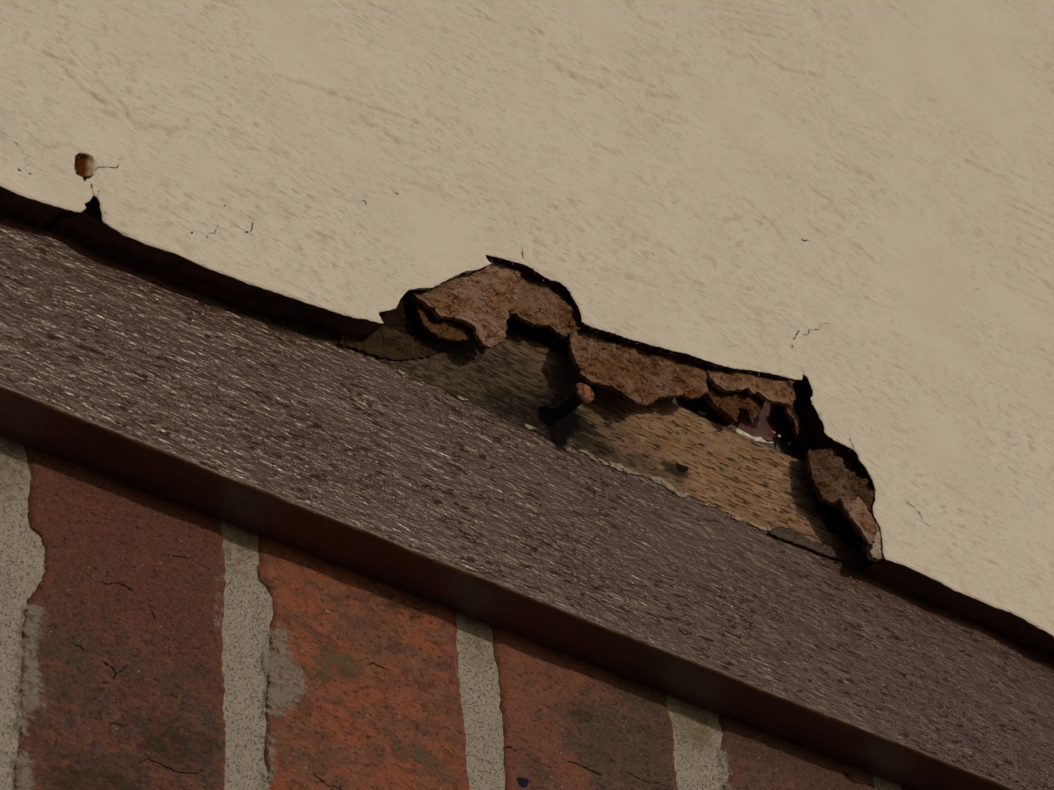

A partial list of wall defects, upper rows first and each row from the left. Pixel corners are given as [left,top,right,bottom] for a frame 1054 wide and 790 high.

rust [75,152,94,180]
spalling [337,255,885,574]